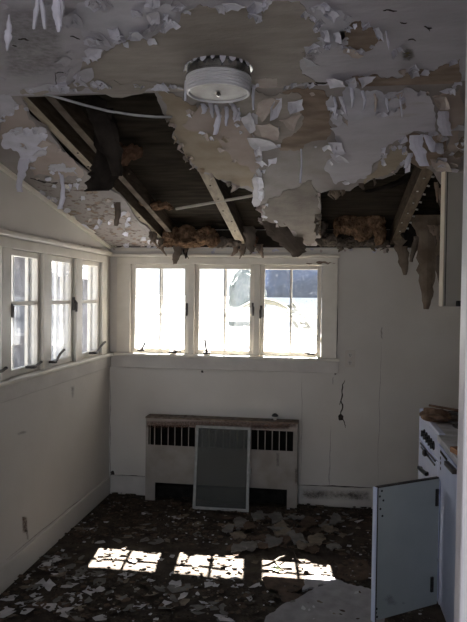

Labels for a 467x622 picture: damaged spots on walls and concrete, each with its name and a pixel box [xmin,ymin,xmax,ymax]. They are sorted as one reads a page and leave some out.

peeling [0,0,465,253]
crack [310,381,372,488]